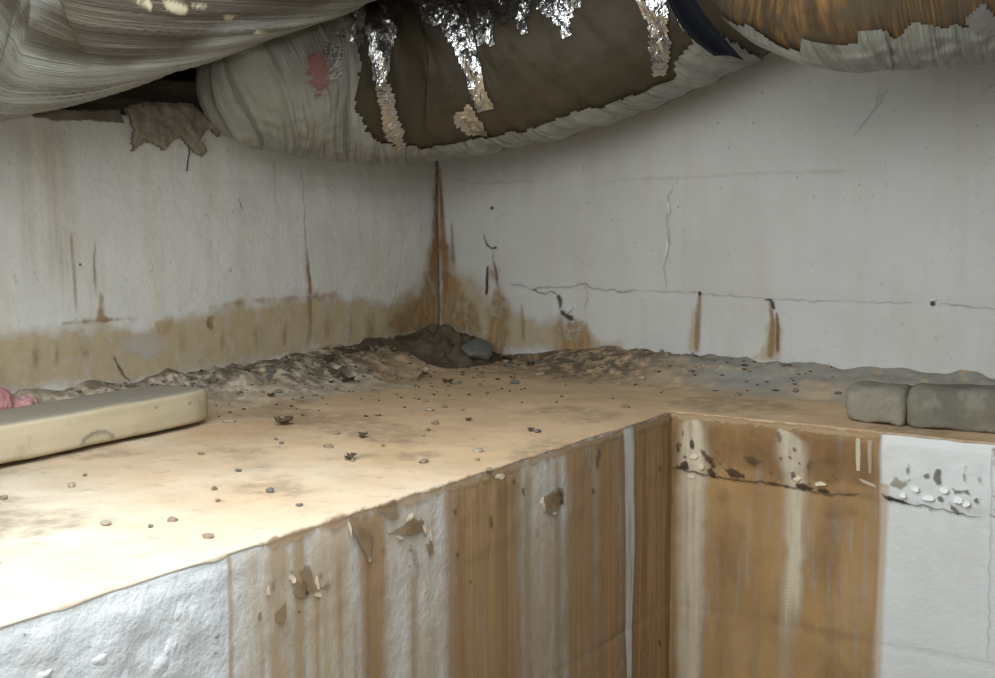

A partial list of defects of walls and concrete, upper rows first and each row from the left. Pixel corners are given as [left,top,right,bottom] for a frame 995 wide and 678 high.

rust [392,174,589,354]
water stain [0,298,429,387]
rust [765,299,779,356]
spalling [677,440,836,493]
peeling [884,468,978,515]
water stain [268,411,885,678]